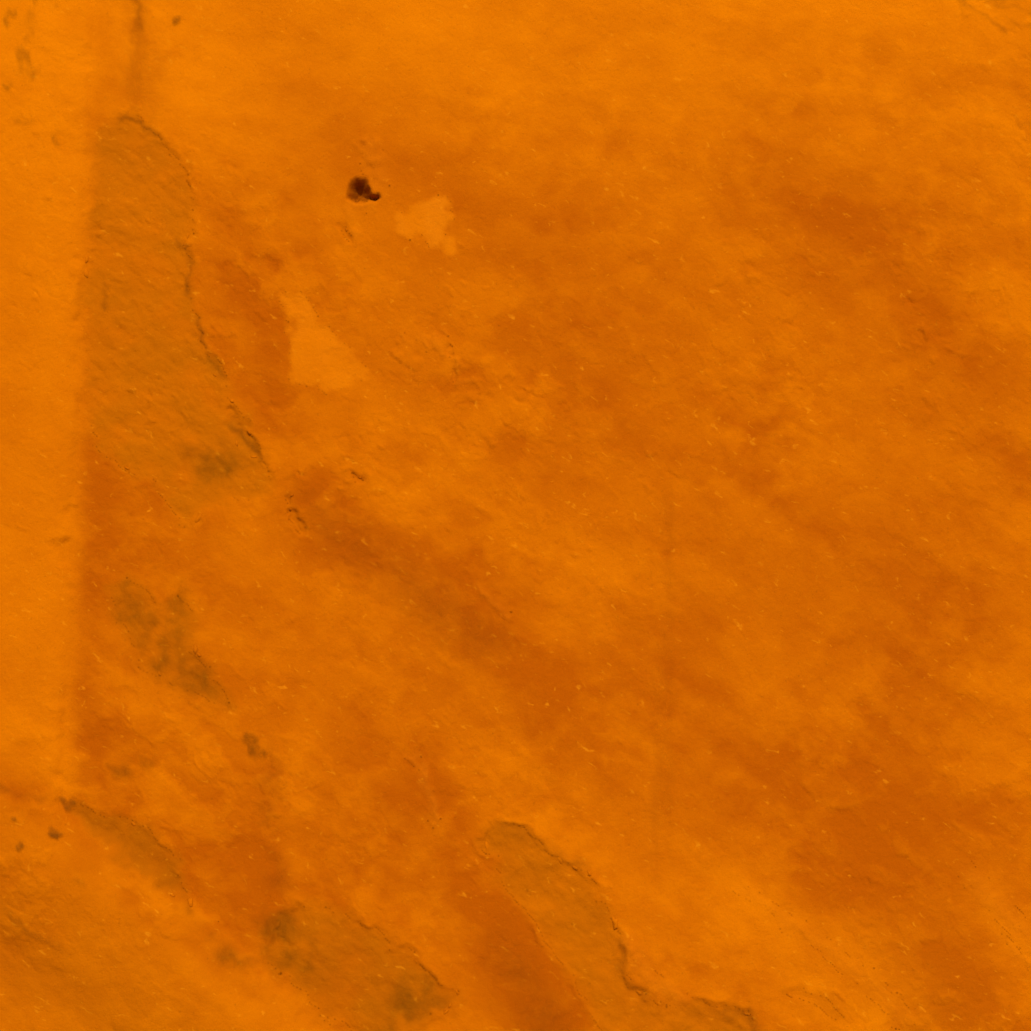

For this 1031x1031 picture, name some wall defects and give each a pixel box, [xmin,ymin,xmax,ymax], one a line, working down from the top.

spalling [351,183,376,202]
spalling [226,406,261,458]